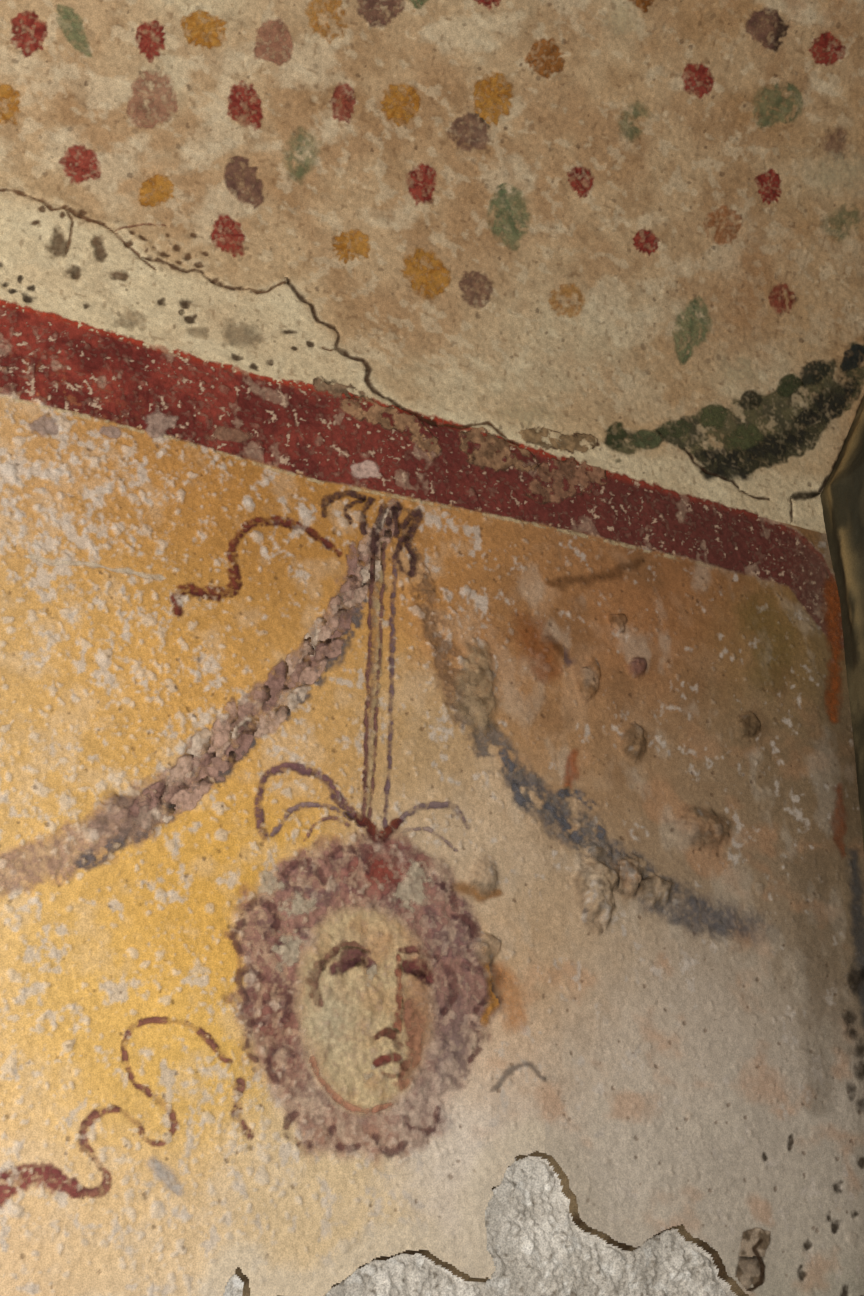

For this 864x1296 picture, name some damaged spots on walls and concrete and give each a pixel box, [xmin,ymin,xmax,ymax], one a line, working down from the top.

crack [0,189,519,446]
crack [684,397,864,522]
spalling [223,1267,250,1296]
spalling [325,1151,770,1296]